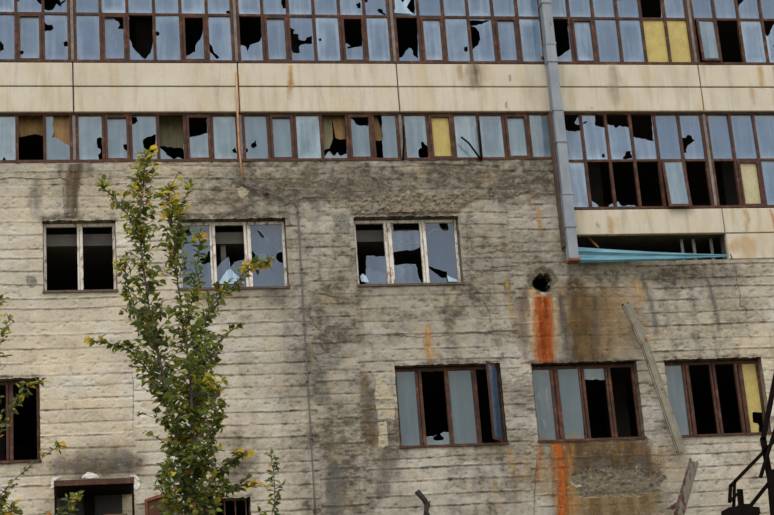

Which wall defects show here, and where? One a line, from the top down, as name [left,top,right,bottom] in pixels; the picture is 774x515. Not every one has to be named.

damp [66,164,90,216]
spalling [527,265,558,297]
crack [369,288,527,355]
rust [529,289,555,362]
damp [559,279,618,361]
rust [539,442,571,515]
spalling [570,468,666,498]